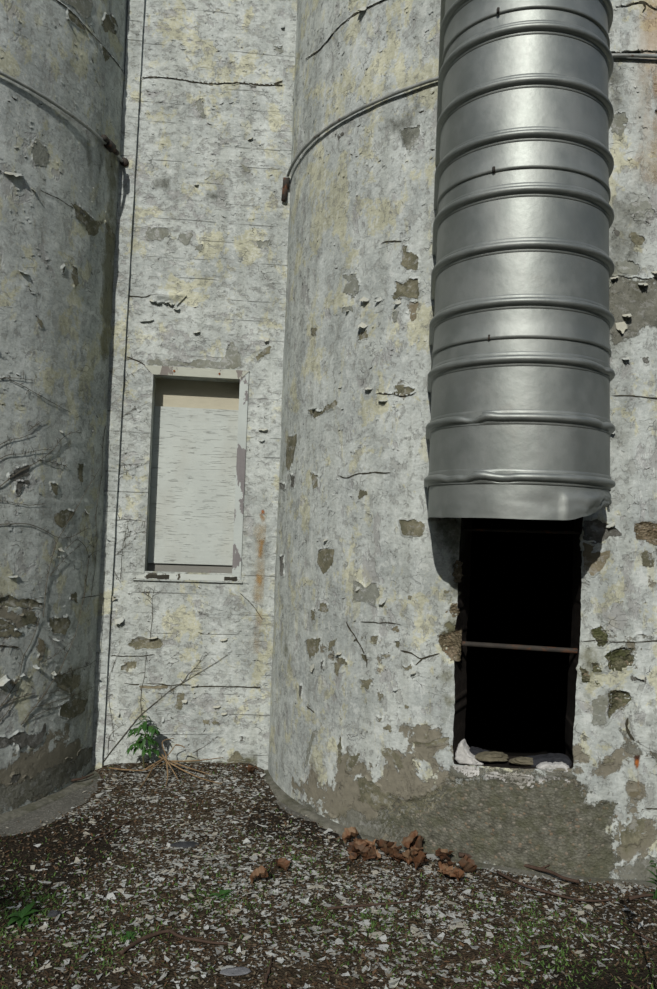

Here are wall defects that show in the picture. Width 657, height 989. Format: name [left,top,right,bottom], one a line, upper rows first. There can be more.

crack [56,0,284,86]
crack [305,0,384,59]
crack [616,1,657,12]
peeling [609,195,657,349]
peeling [133,334,271,369]
peeling [1,457,42,497]
peeling [278,400,344,511]
peeling [383,517,427,539]
peeling [579,512,623,578]
spalling [634,507,657,567]
peeling [275,527,380,771]
spalling [0,575,657,989]